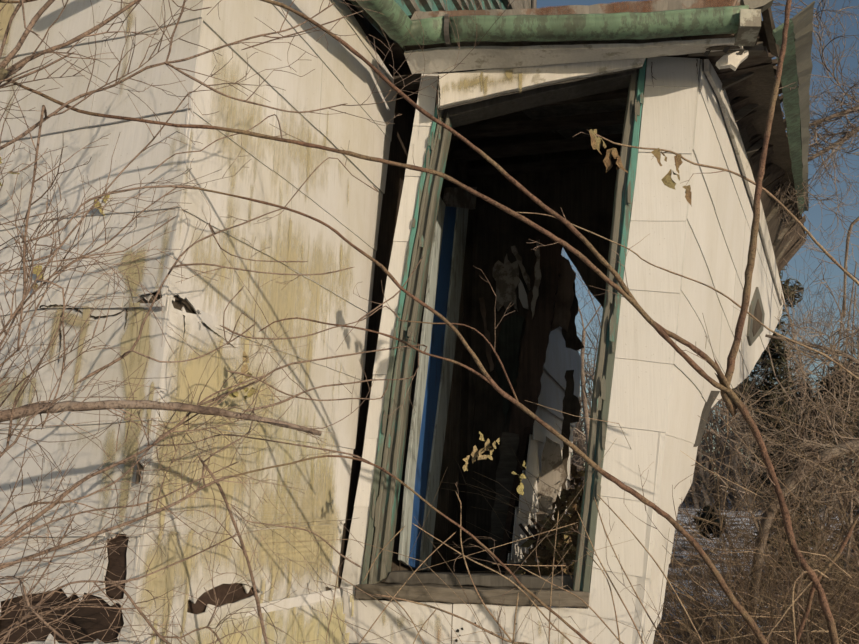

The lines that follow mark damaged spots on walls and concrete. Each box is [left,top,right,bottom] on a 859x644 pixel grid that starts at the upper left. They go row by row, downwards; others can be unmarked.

water stain [128,251,149,361]
spalling [132,294,193,314]
water stain [120,382,194,644]